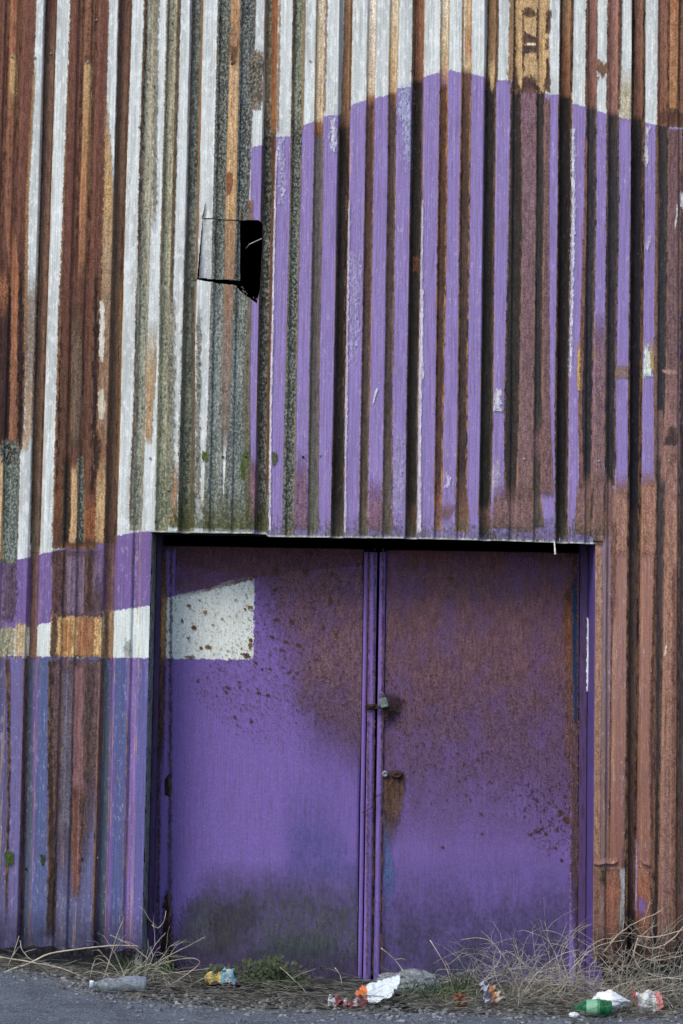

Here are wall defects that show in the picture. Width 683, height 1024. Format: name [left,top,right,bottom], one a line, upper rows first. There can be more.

corrosion [0,0,132,940]
corrosion [155,0,580,976]
corrosion [433,0,683,960]